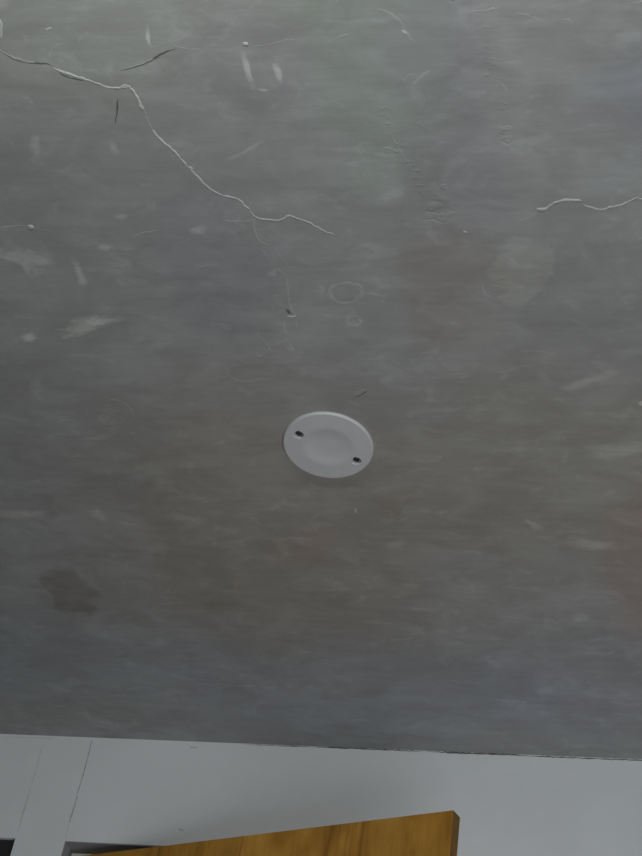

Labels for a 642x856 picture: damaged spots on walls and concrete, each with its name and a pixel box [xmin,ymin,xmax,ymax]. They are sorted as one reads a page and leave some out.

crack [0,20,335,246]
crack [517,197,642,222]